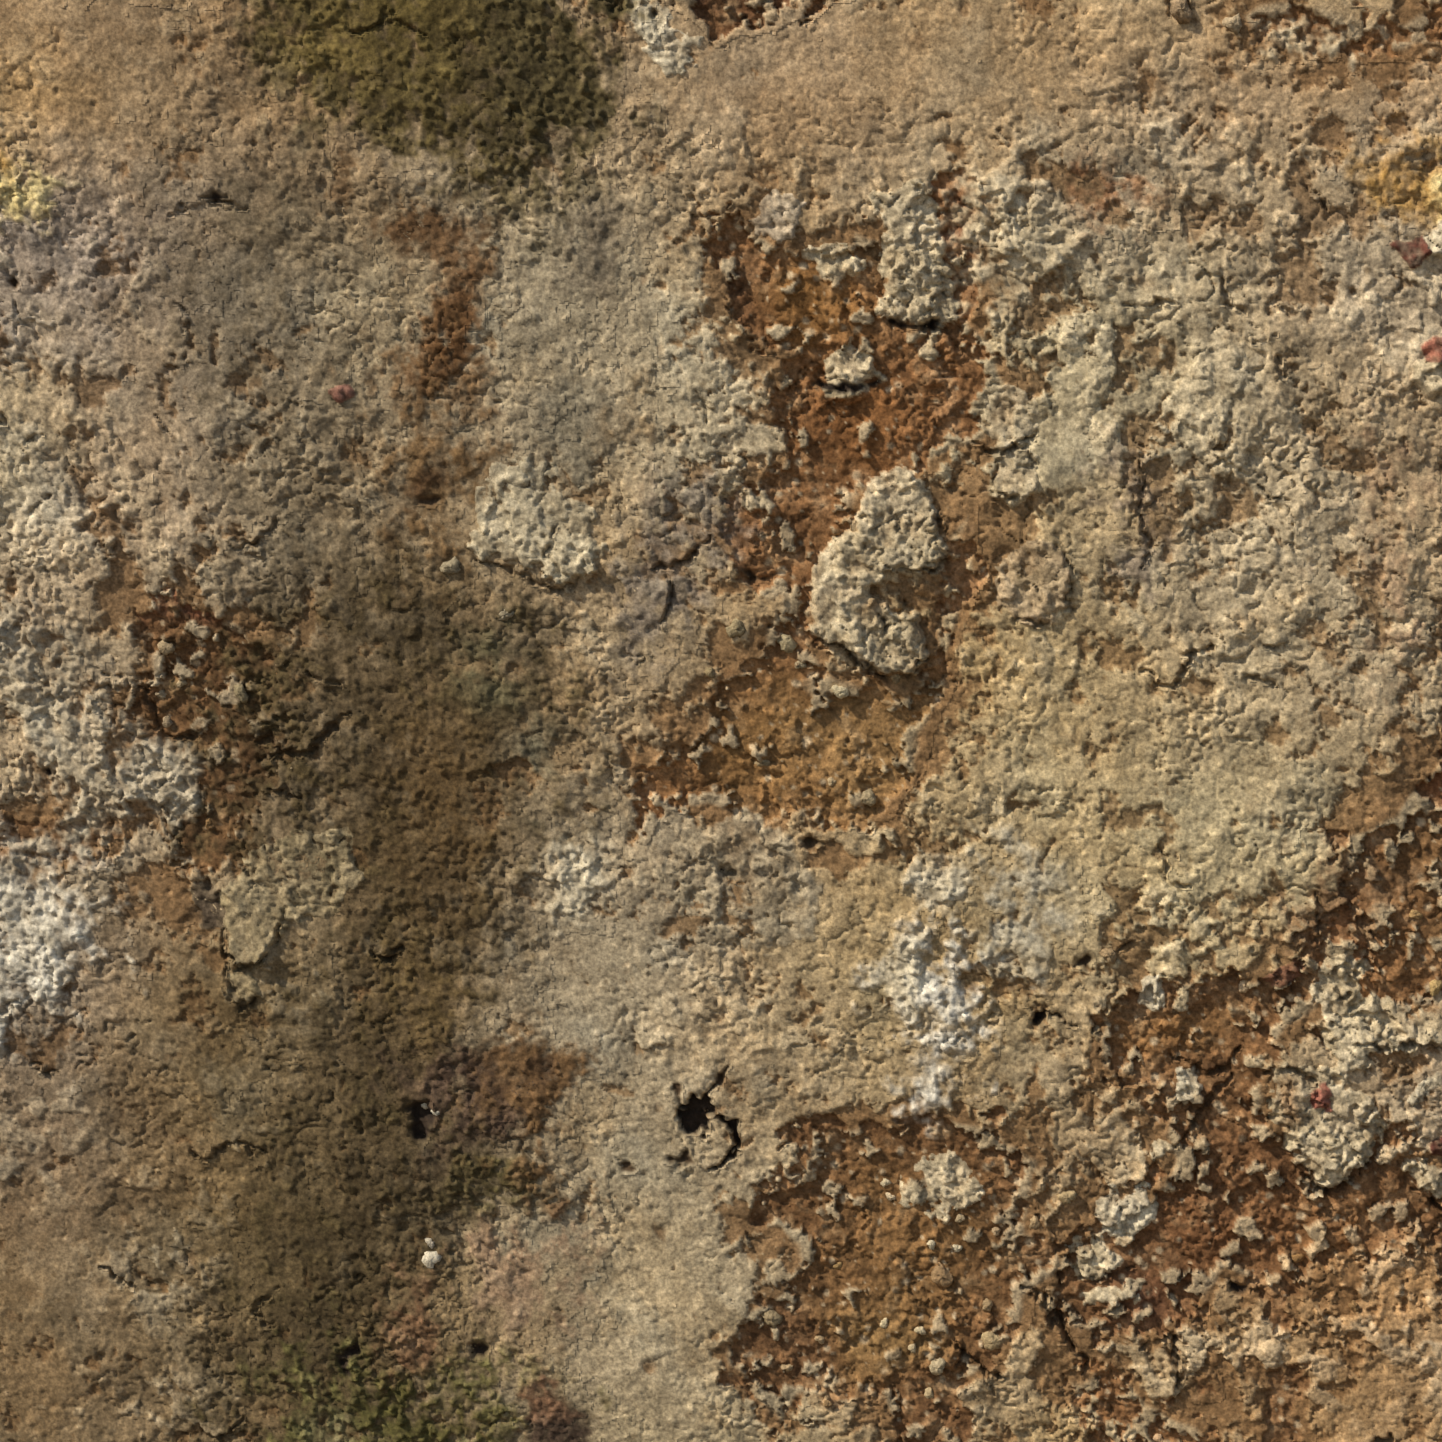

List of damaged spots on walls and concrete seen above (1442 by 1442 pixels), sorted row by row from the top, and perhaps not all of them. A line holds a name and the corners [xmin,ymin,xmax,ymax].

spalling [633,0,855,77]
leakage [0,129,84,251]
leakage [111,31,775,700]
spalling [621,167,1073,859]
leakage [180,874,230,946]
efflorescence [523,827,624,951]
leakage [363,1026,483,1207]
spalling [713,727,1442,1442]
leakage [489,1368,635,1442]